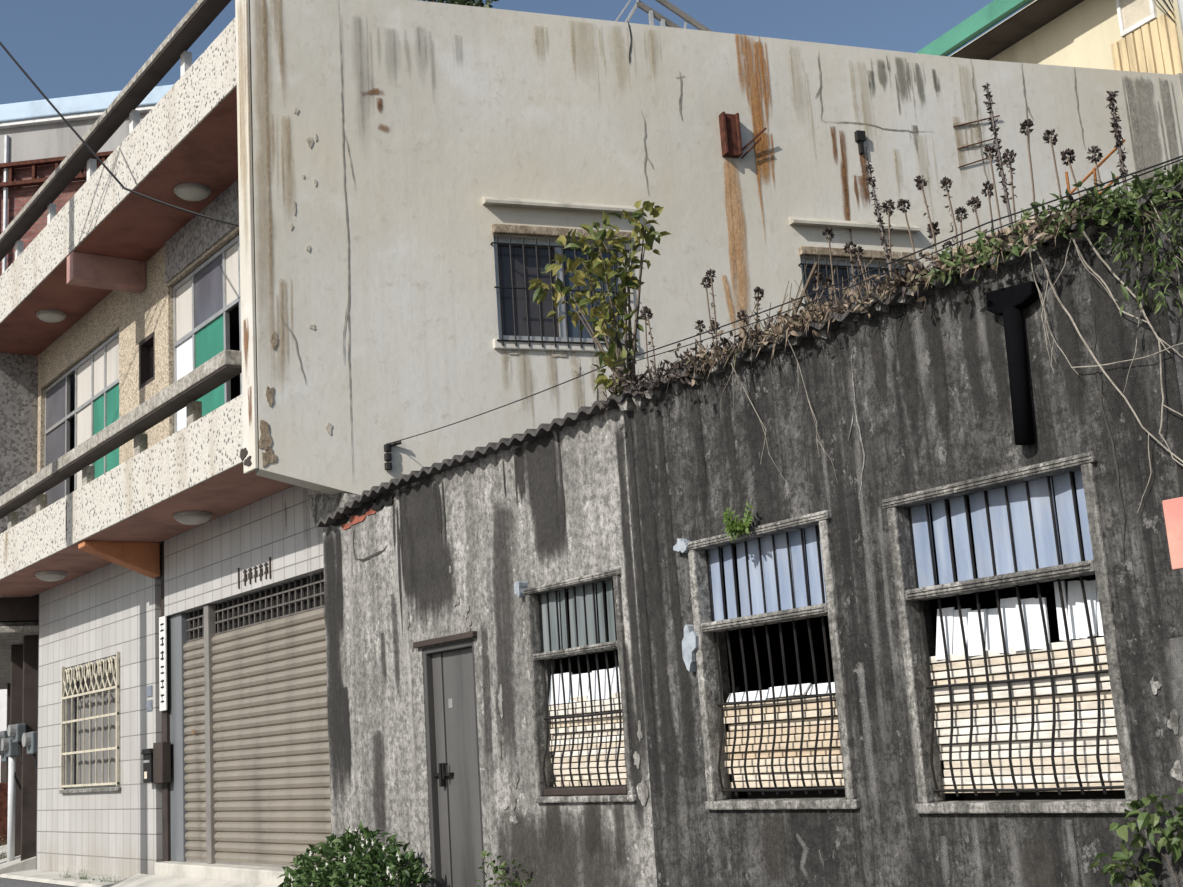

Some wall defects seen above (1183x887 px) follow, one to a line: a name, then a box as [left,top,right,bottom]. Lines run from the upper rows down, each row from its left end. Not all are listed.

corrosion [722,161,748,336]
corrosion [736,34,774,223]
corrosion [830,126,870,230]
damp [675,388,706,490]
damp [720,377,736,488]
damp [324,529,351,794]
damp [373,733,384,838]
damp [381,477,453,687]
damp [481,431,566,754]
damp [498,404,693,887]
flaking render [1150,680,1162,695]
flaking render [1167,709,1183,782]